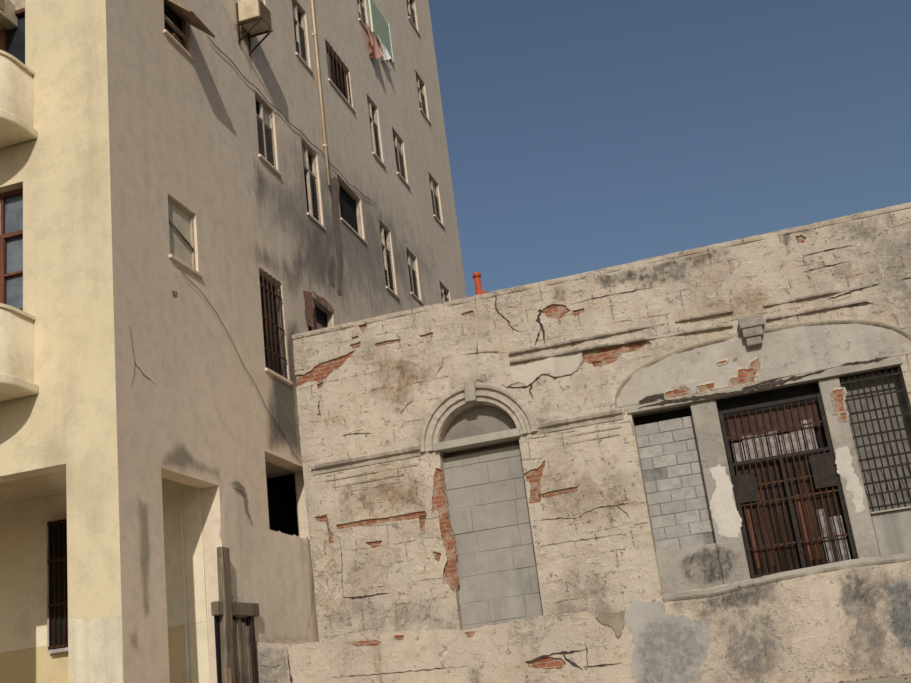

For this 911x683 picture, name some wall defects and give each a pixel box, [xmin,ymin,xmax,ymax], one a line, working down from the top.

crack [828,277,911,307]
crack [495,295,545,344]
spalling [295,325,367,389]
crack [477,357,583,398]
peeling [509,340,651,386]
spalling [662,381,717,400]
spalling [716,357,763,388]
spalling [830,387,849,423]
spalling [524,461,578,503]
spalling [316,467,459,592]
crack [525,642,620,670]